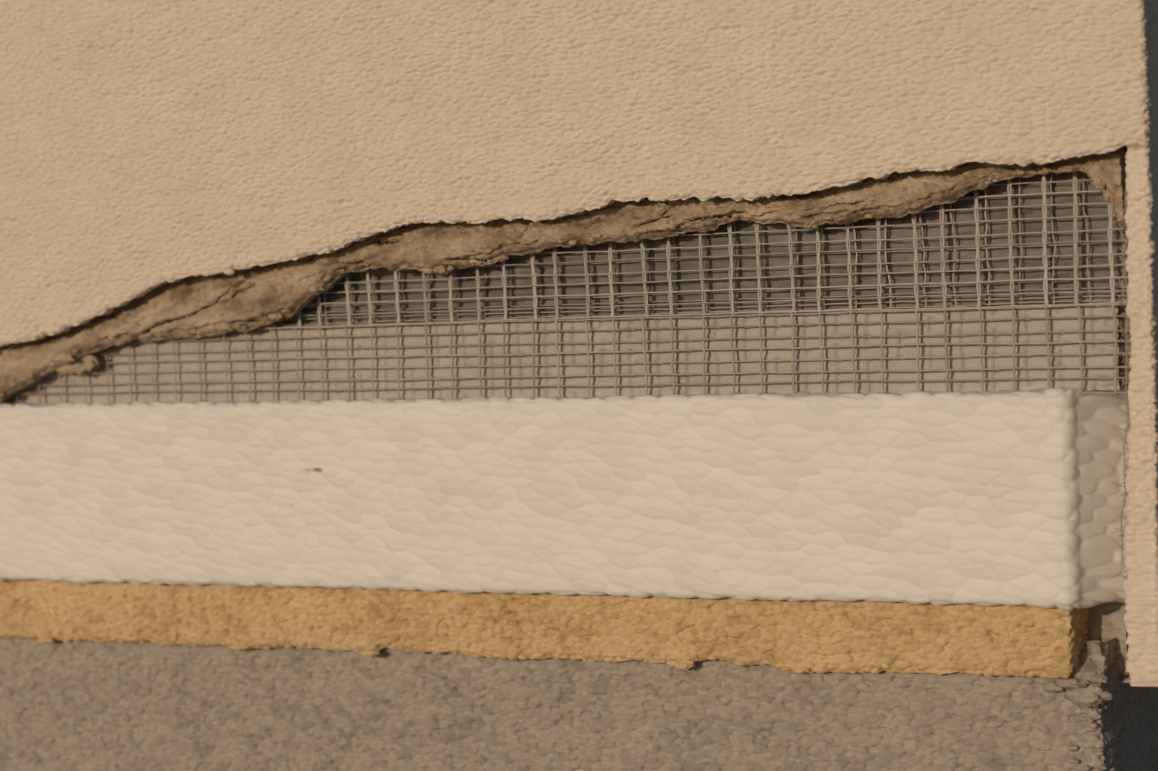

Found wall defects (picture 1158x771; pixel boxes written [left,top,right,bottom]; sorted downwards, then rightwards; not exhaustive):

spalling [0,146,1131,579]